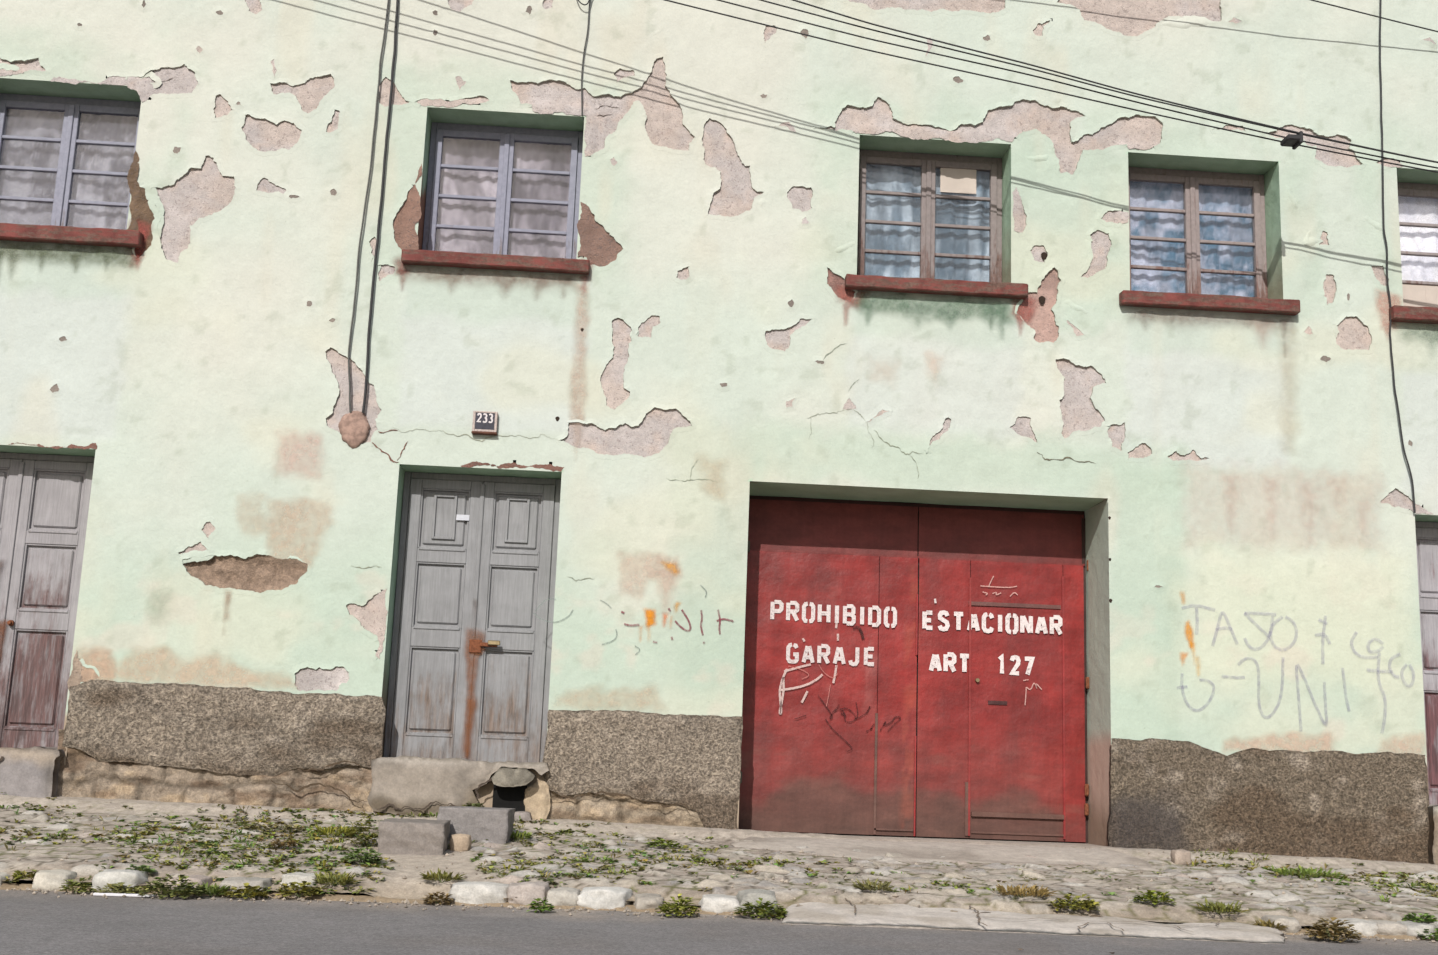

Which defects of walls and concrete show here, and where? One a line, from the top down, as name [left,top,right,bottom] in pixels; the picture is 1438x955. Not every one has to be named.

peeling [211,0,267,20]
peeling [807,0,1011,46]
peeling [1028,0,1226,41]
peeling [0,41,345,268]
peeling [372,53,818,222]
peeling [770,92,1168,180]
peeling [1005,186,1214,466]
peeling [555,310,696,463]
flaking render [461,461,564,471]
flaking render [173,516,313,599]
rust [465,632,483,754]